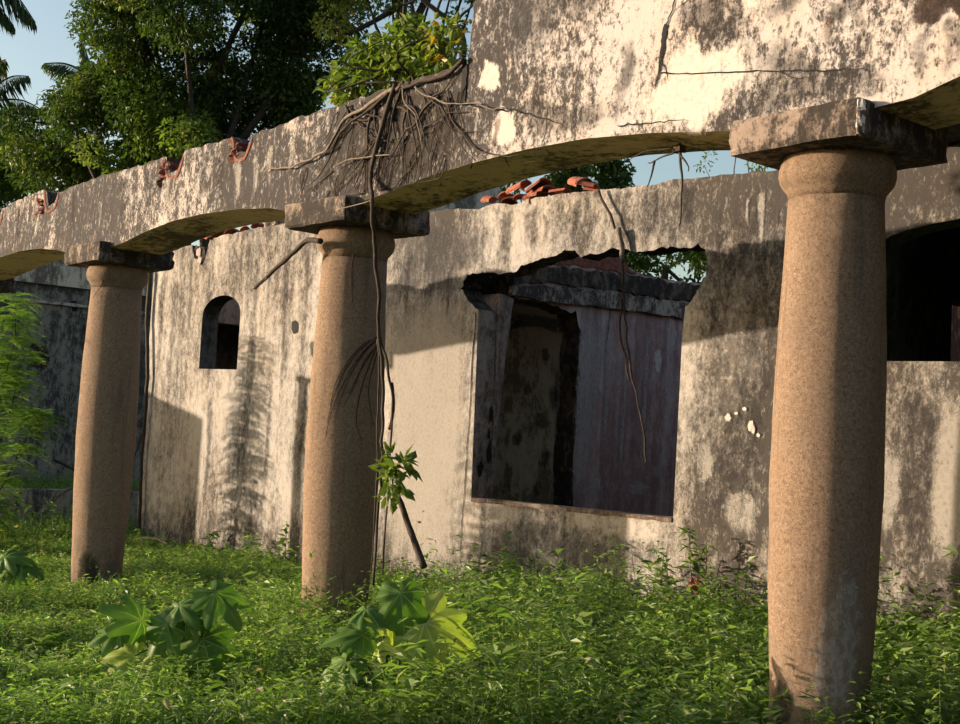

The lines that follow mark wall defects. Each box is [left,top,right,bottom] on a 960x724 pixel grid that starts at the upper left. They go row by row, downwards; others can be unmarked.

damp [909,0,960,26]
crack [617,0,864,127]
peeling [725,407,760,437]
damp [883,448,900,530]